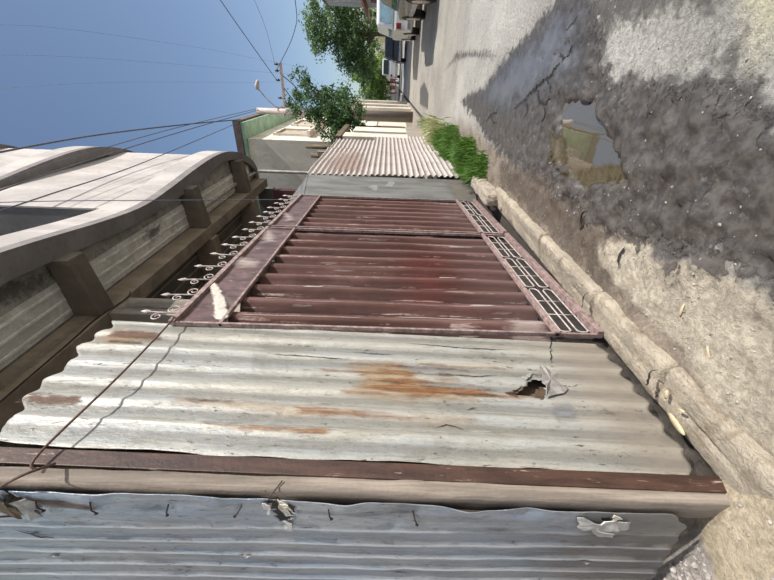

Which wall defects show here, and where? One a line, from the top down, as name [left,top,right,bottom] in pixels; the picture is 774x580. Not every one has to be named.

crack [488,14,580,123]
leakage [462,0,774,300]
rust [367,363,514,397]
rust [298,407,364,415]
peeling [0,498,43,521]
peeling [577,515,631,538]